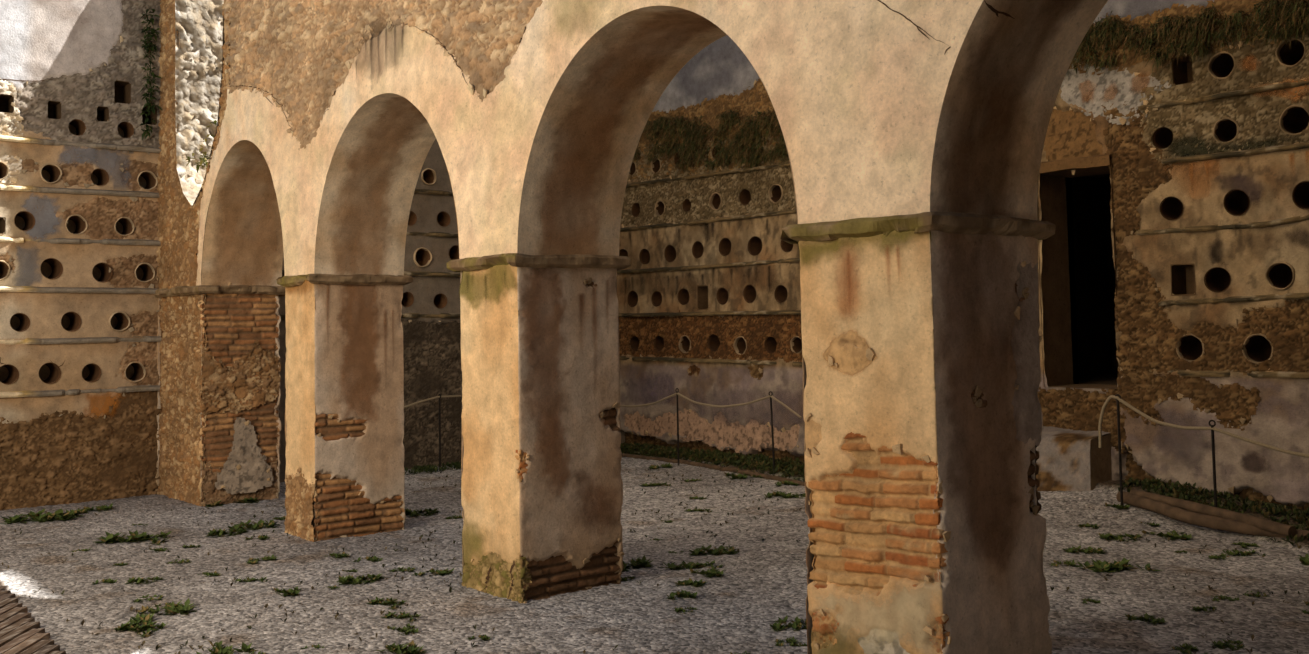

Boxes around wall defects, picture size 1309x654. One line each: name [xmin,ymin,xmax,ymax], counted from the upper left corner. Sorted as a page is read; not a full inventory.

crack [878,0,950,55]
spalling [0,0,543,542]
leakage [523,269,563,379]
spalling [1011,0,1309,515]
flaking render [461,538,624,603]
flaking render [806,432,951,596]